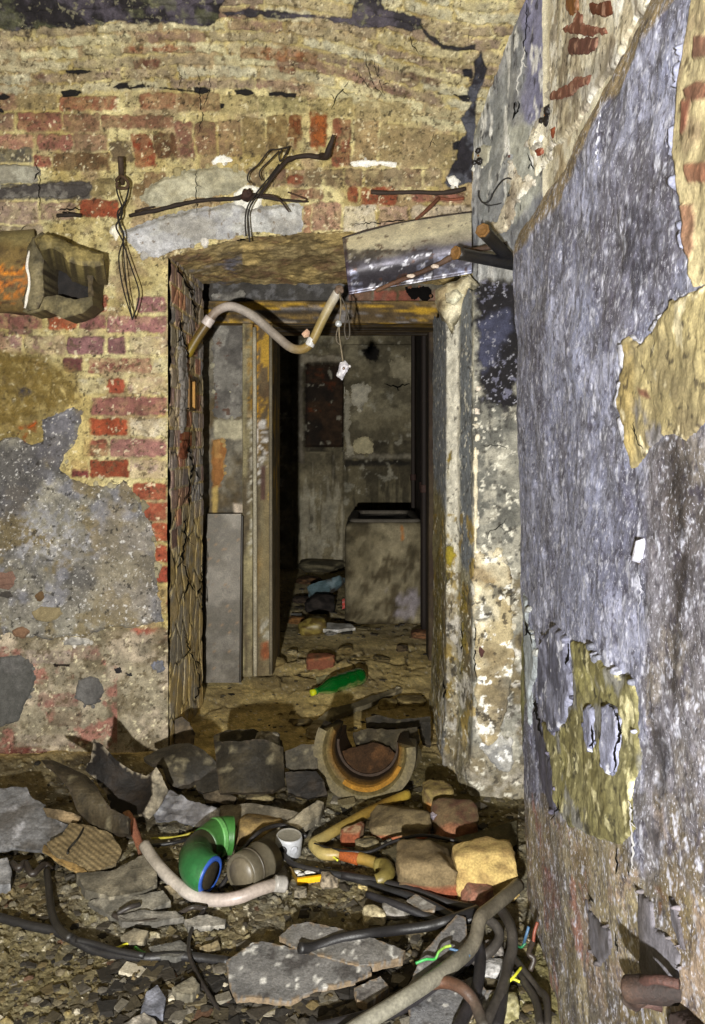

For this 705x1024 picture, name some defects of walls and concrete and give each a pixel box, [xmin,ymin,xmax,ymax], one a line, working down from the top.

peeling [491,0,650,234]
damp [0,353,76,425]
crack [175,262,198,369]
peeling [613,0,705,469]
peeling [0,407,164,648]
crack [177,427,204,614]
crack [183,631,201,705]
peeling [471,408,645,845]
peeling [585,899,613,967]